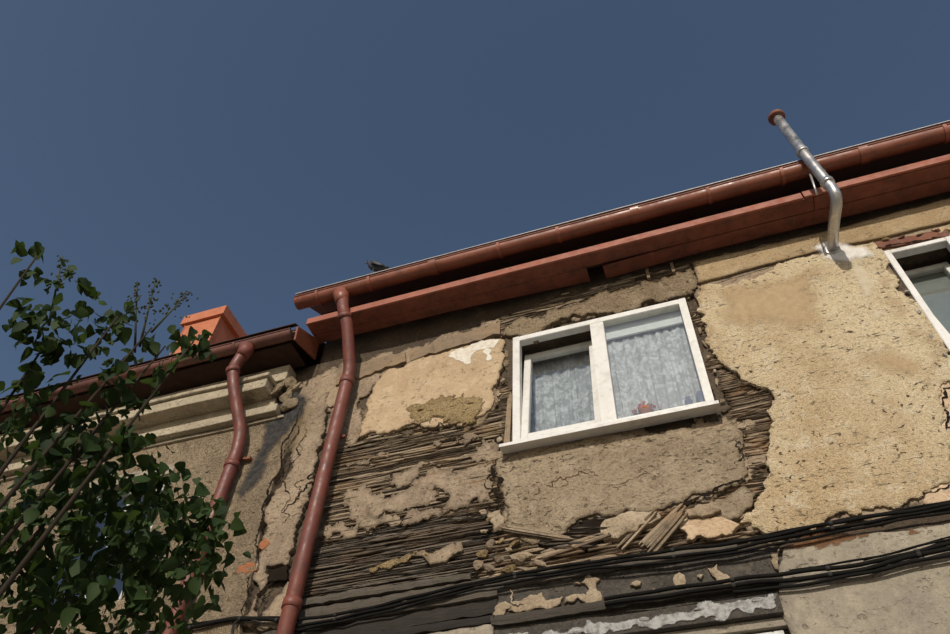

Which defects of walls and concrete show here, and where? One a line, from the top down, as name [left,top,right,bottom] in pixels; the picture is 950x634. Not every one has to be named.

flaking render [268,376,301,412]
crack [942,383,950,430]
flaking render [301,262,789,615]
crack [236,407,320,629]
crack [895,484,950,510]
peeling [542,594,776,634]